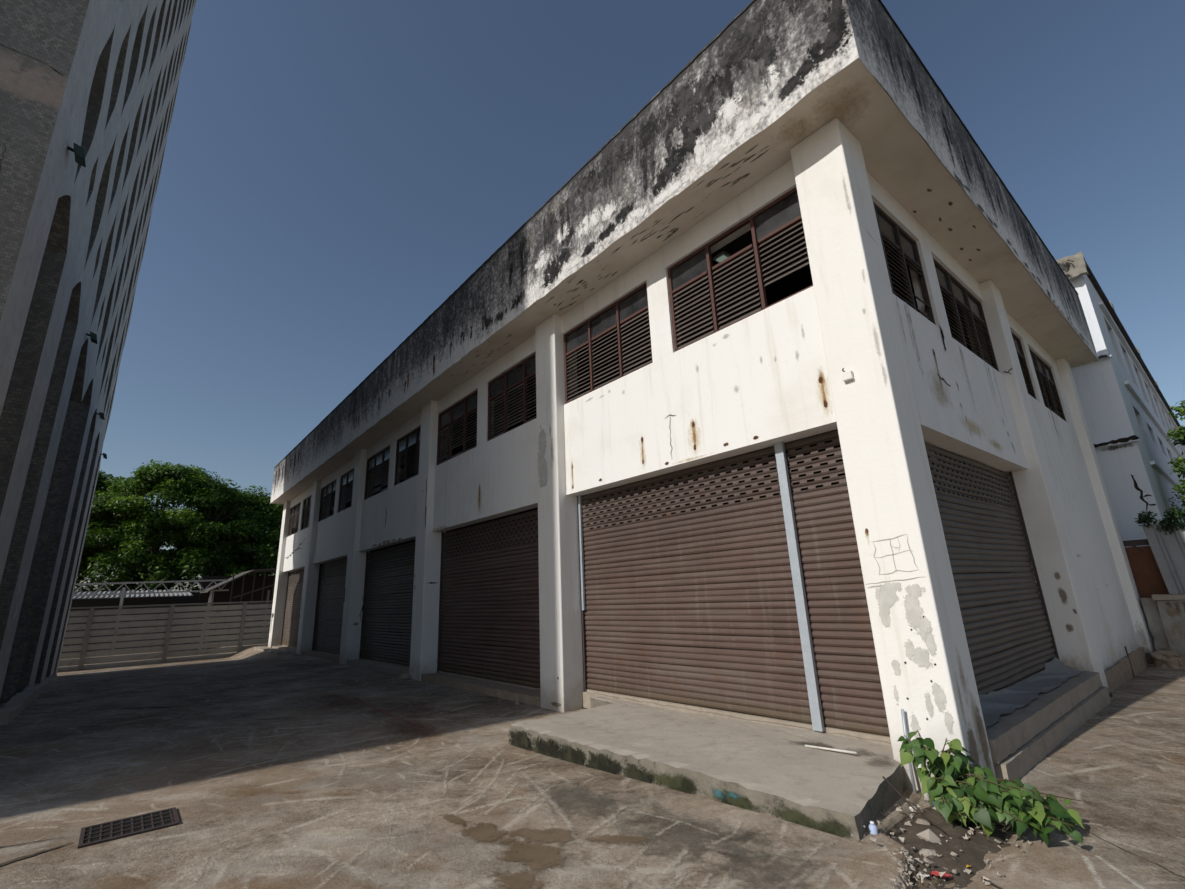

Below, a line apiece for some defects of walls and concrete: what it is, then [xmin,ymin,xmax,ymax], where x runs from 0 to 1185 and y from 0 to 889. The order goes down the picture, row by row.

damp [776,0,852,103]
damp [450,0,808,356]
crack [1130,474,1156,511]
peeling [875,582,954,737]